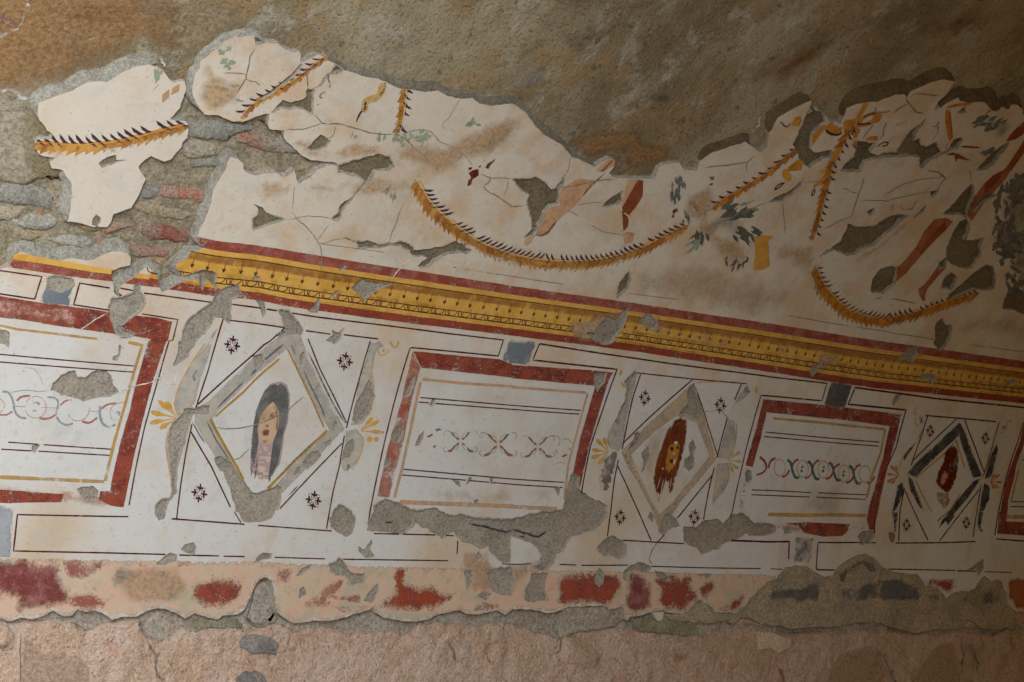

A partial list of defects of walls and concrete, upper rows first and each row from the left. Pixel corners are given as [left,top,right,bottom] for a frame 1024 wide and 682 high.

crack [226,50,261,94]
flaking render [0,94,329,284]
crack [291,187,344,275]
crack [289,101,518,207]
flaking render [512,175,565,237]
crack [564,158,635,235]
flaking render [819,207,924,258]
flaking render [938,185,997,298]
flaking render [173,284,304,364]
flaking render [50,370,119,402]
flaking render [214,455,283,523]
peeling [0,473,1022,653]